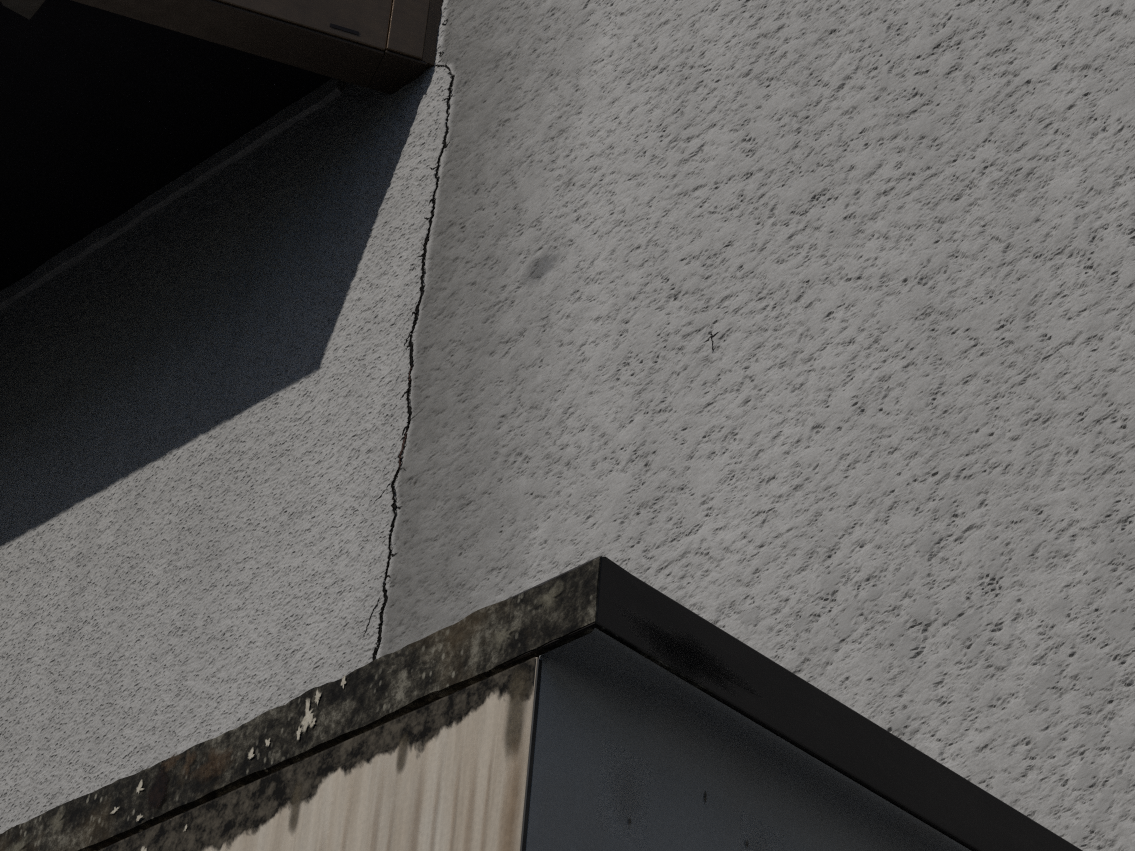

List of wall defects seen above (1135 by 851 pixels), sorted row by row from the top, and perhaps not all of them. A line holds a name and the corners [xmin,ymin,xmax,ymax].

crack [362,64,454,661]
water stain [98,657,535,851]